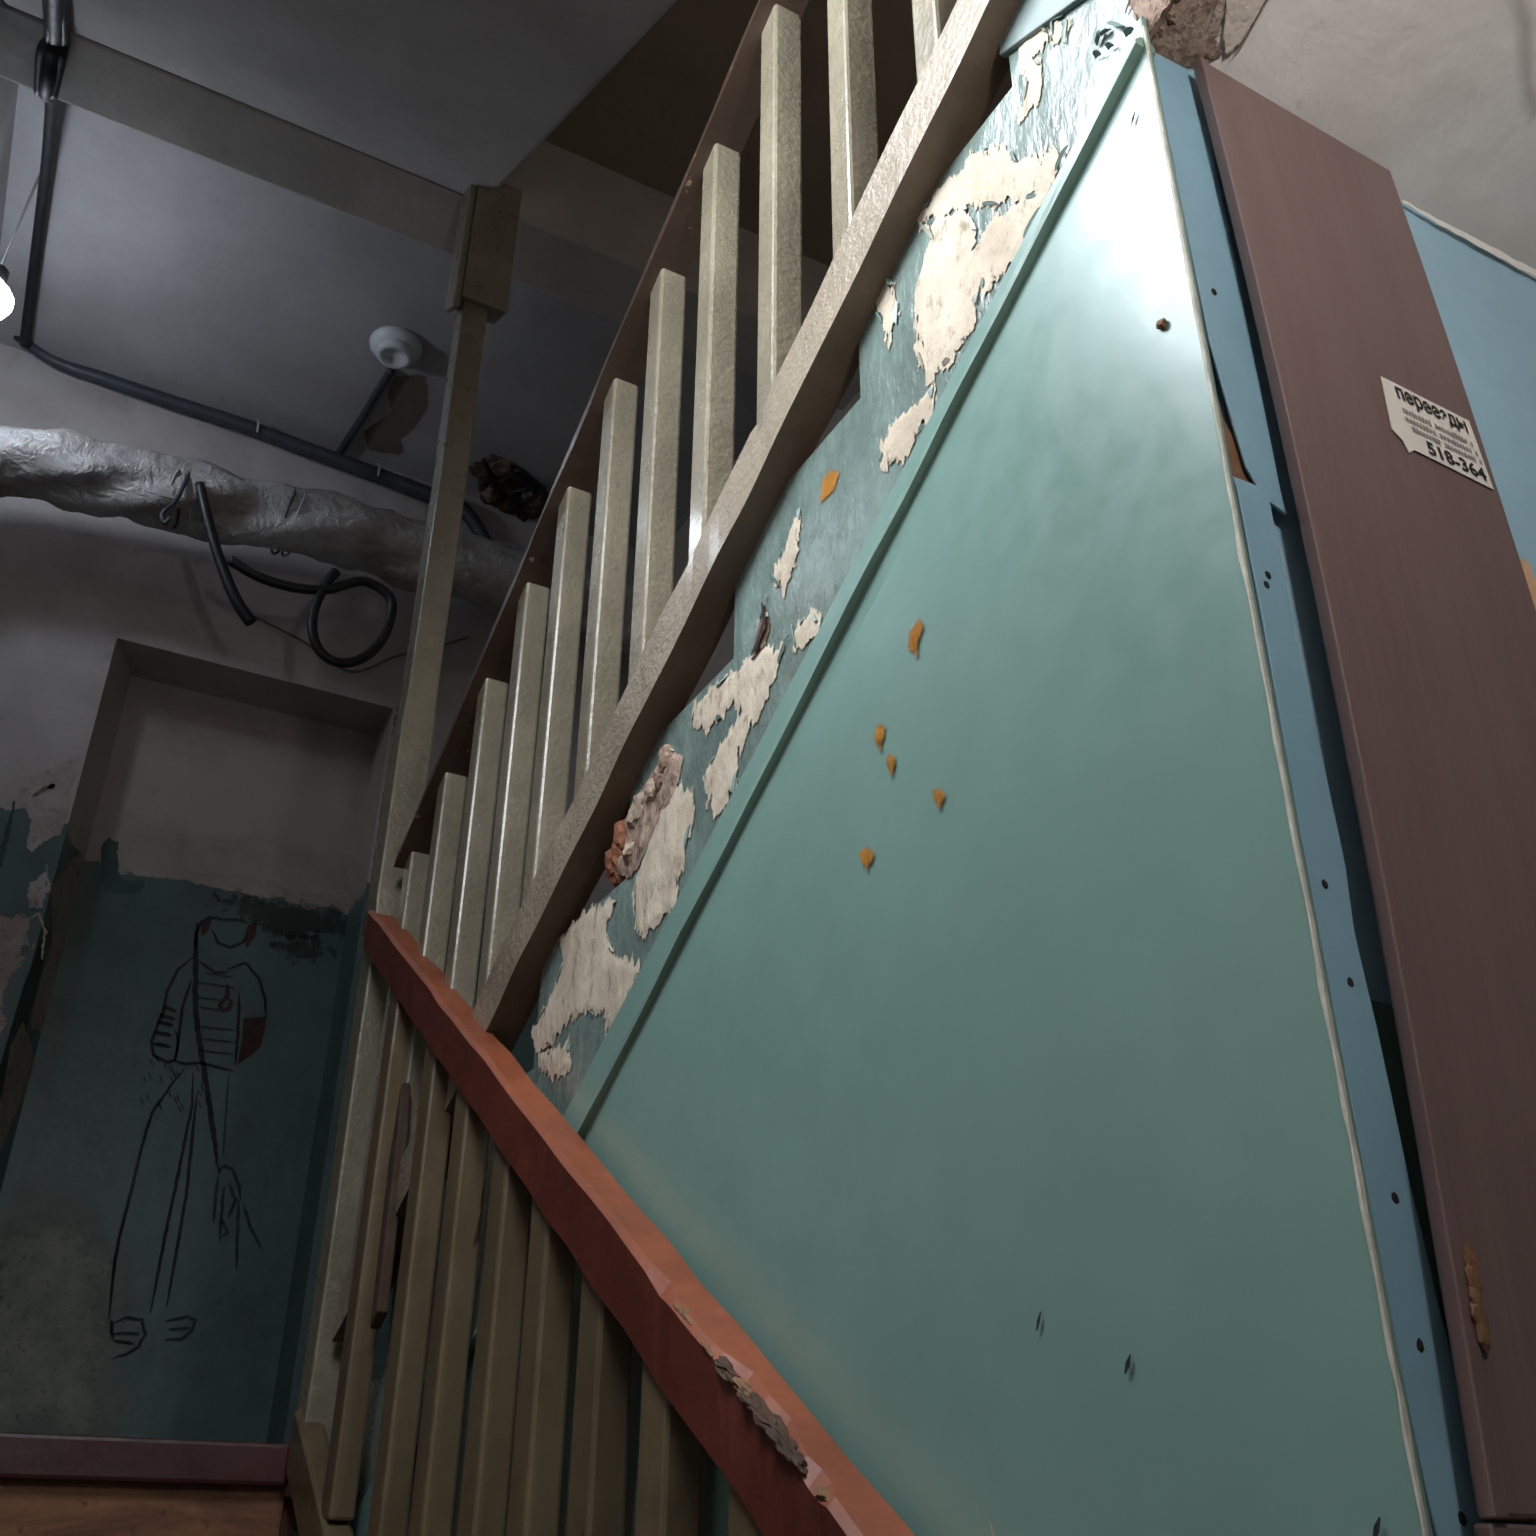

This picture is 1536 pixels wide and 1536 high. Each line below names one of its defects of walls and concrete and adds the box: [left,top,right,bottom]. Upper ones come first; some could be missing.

spalling [1093,0,1266,67]
peeling [1017,15,1072,125]
peeling [873,141,1068,474]
corrosion [908,619,923,656]
corrosion [874,725,895,774]
peeling [531,508,821,1082]
corrosion [932,789,945,807]
corrosion [860,847,874,868]
peeling [0,757,80,1150]